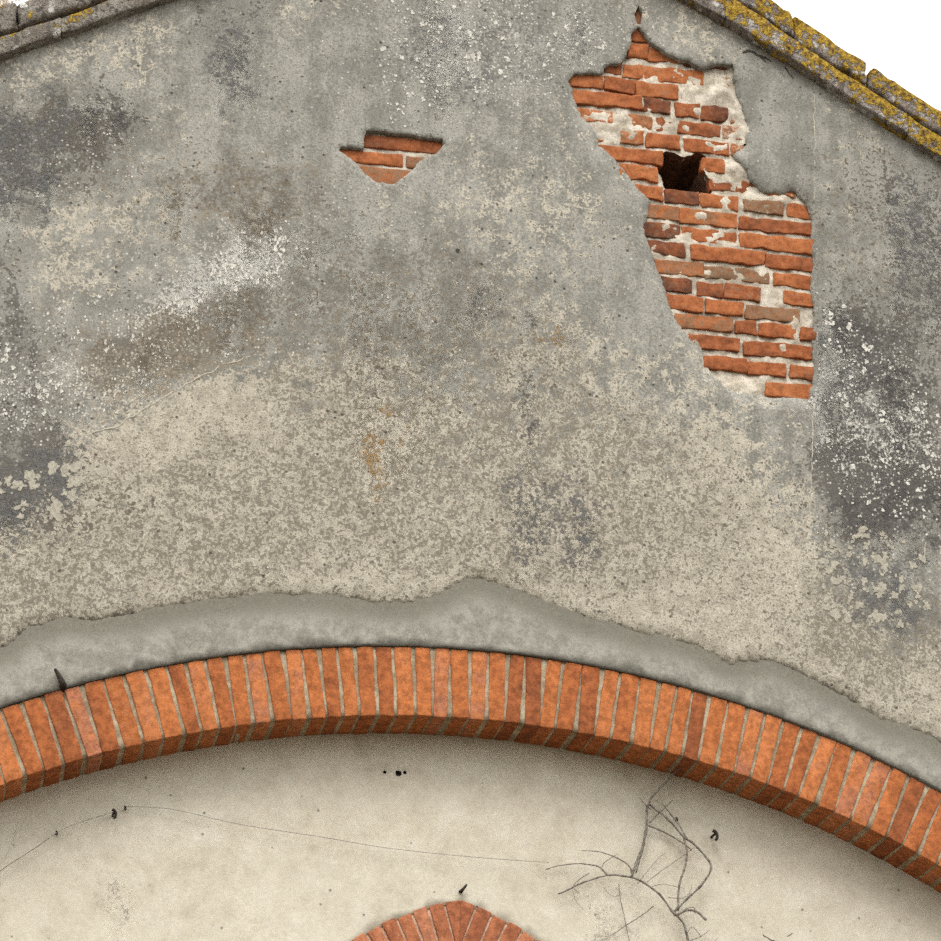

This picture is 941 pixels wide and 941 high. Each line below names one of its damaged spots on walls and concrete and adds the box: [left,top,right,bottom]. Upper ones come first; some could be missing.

water stain [0,77,148,229]
spalling [339,0,941,637]
water stain [809,303,931,462]
water stain [885,173,941,318]
water stain [0,424,90,557]
water stain [818,473,941,634]